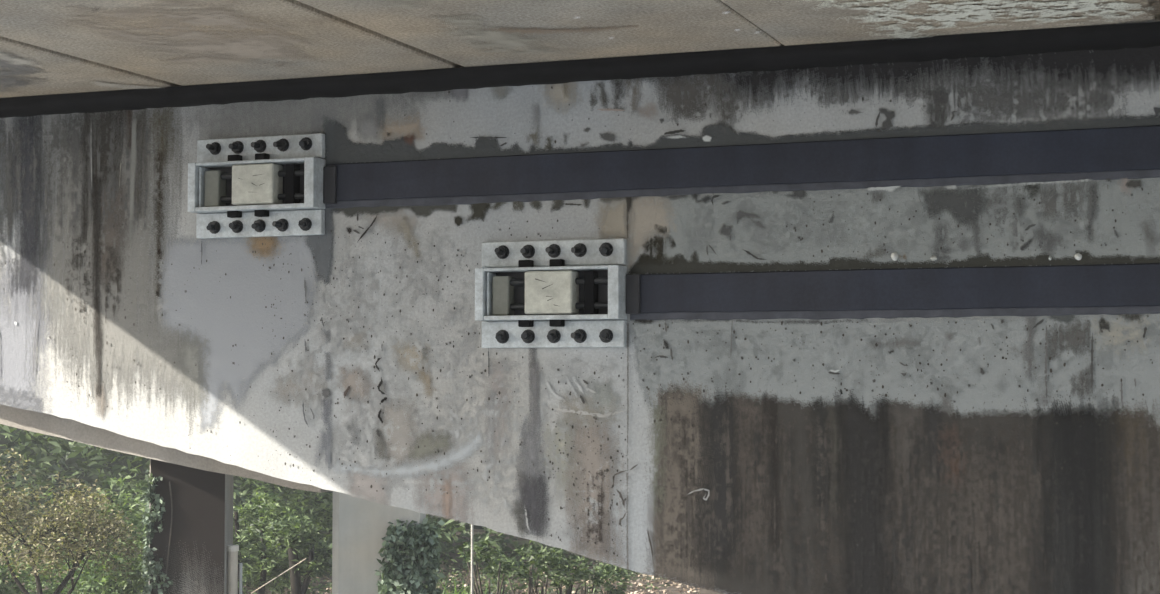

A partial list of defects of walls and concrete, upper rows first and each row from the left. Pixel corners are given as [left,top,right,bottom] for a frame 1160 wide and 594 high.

leakage [525,46,1160,151]
leakage [0,89,469,434]
leakage [150,459,225,594]
leakage [265,329,627,568]
leakage [642,314,1160,594]